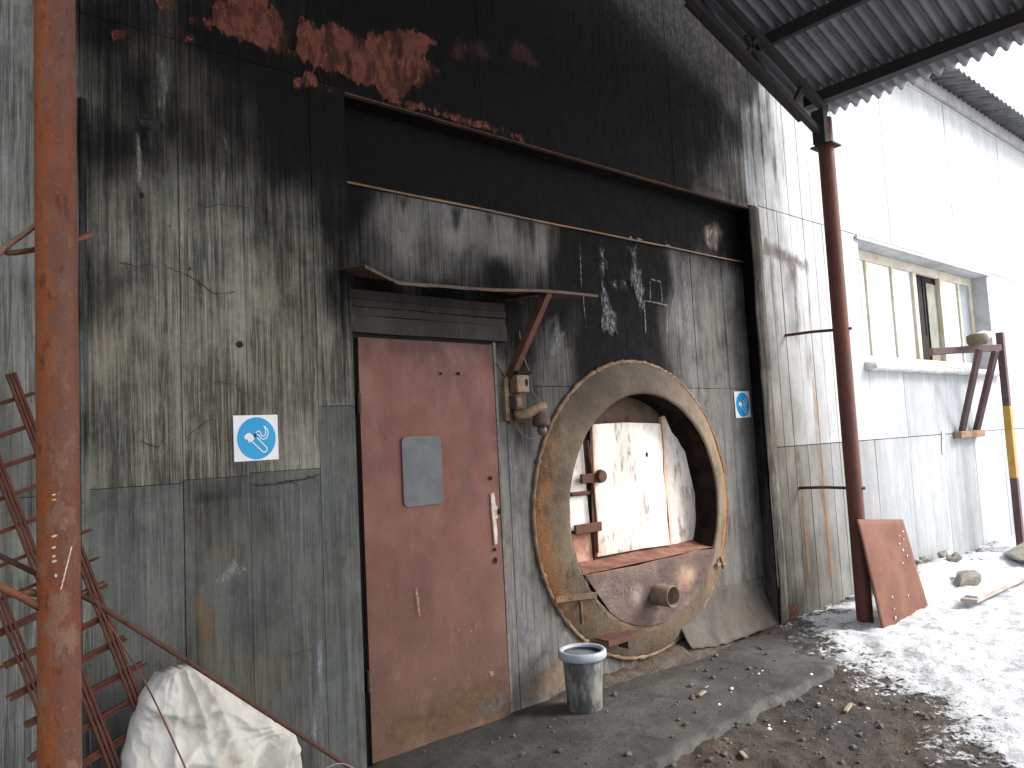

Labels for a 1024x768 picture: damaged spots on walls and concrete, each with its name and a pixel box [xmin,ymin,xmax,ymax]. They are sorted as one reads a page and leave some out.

corrosion [382,91,522,142]
crack [120,262,233,305]
crack [254,474,321,486]